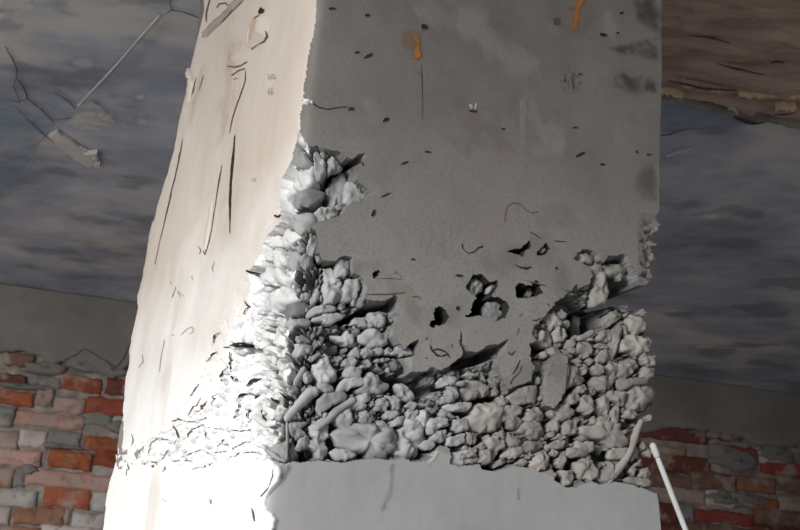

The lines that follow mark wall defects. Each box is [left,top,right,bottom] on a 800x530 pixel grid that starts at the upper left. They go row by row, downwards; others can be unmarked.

crack [5,46,76,146]
flaking render [48,128,101,169]
crack [155,139,183,262]
crack [199,71,246,271]
spalling [429,274,509,328]
spalling [507,241,551,257]
spalling [515,280,546,299]
spalling [639,212,661,286]
flaking render [0,351,129,530]
flaking render [628,427,800,530]